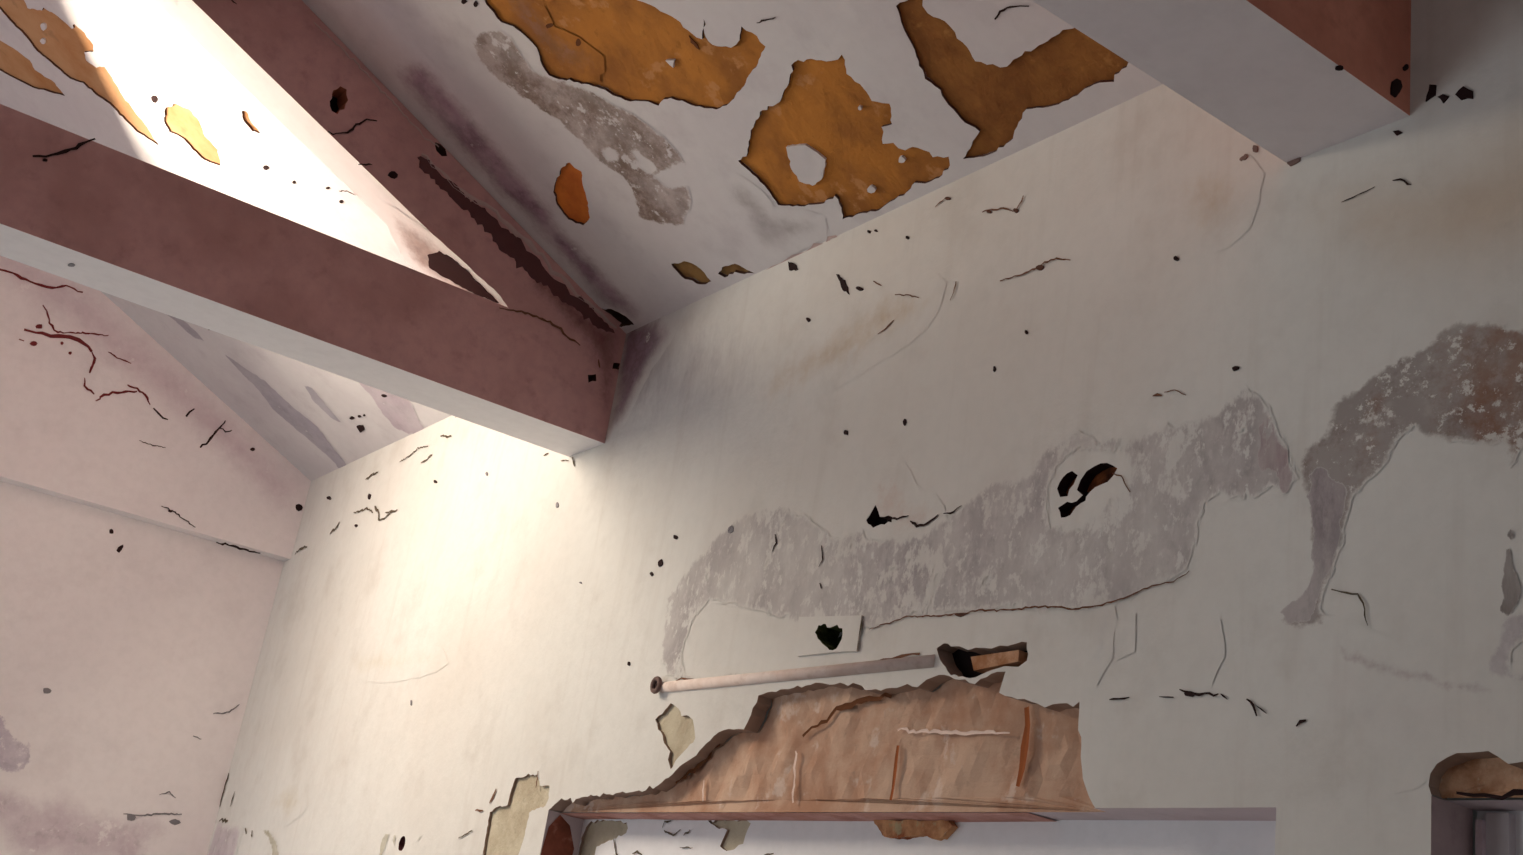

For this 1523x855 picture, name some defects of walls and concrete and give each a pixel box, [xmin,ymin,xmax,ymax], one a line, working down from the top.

peeling [0,0,155,141]
peeling [151,95,220,164]
peeling [461,0,765,226]
peeling [741,0,1128,217]
damp [381,48,947,462]
crack [0,269,255,451]
damp [660,67,1523,794]
damp [0,715,183,855]
peeling [486,775,550,855]